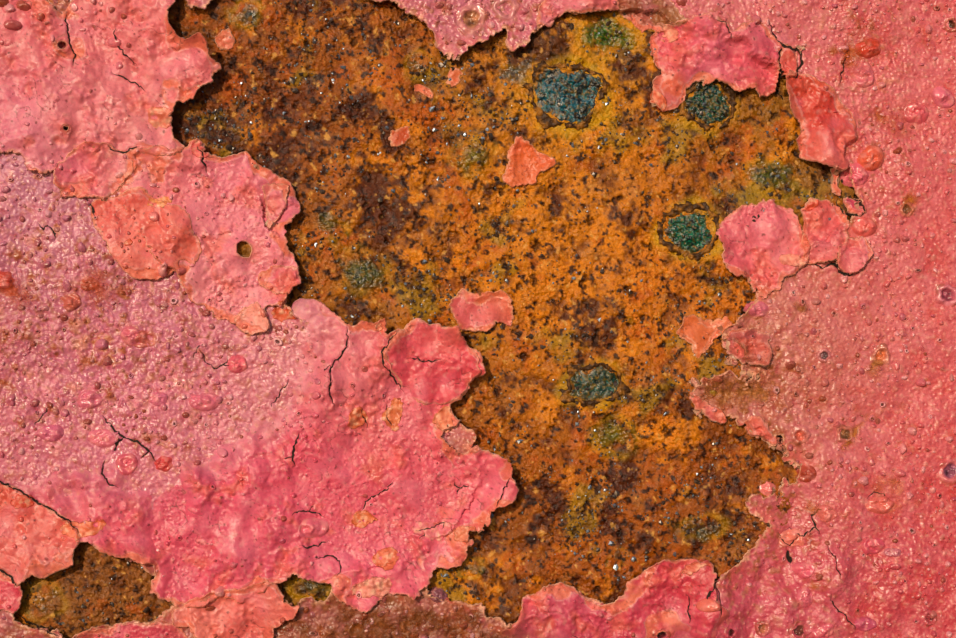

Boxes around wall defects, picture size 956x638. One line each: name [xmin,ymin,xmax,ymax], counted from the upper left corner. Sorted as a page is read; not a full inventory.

peeling [502,136,556,188]
peeling [536,0,874,300]
peeling [0,0,519,638]
corrosion [168,0,858,638]
peeling [676,314,772,366]
peeling [689,392,727,424]
peeling [744,415,785,445]
corrosion [14,542,173,638]
peeling [499,558,733,638]